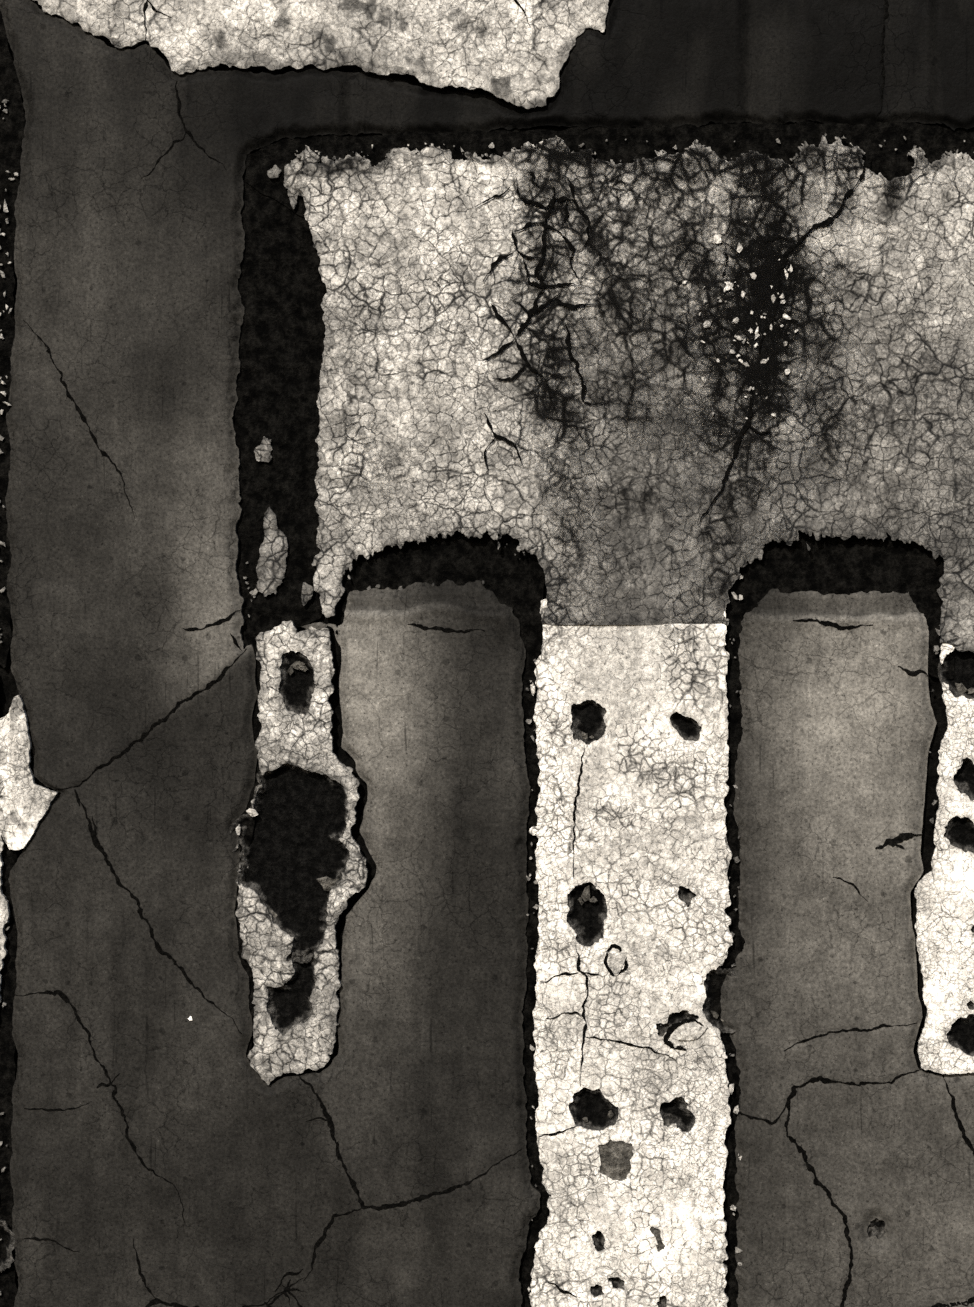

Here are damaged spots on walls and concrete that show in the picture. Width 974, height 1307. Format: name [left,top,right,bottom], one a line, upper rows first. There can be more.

peeling [33,0,609,110]
peeling [234,121,974,745]
peeling [0,695,58,1307]
crack [24,1237,78,1252]
crack [14,990,185,1223]
crack [57,607,249,1034]
spalling [230,760,350,1062]
crack [133,1075,576,1307]
peeling [342,530,551,1307]
peeling [656,530,974,1307]
crack [784,1023,915,1051]
crack [738,1069,974,1307]